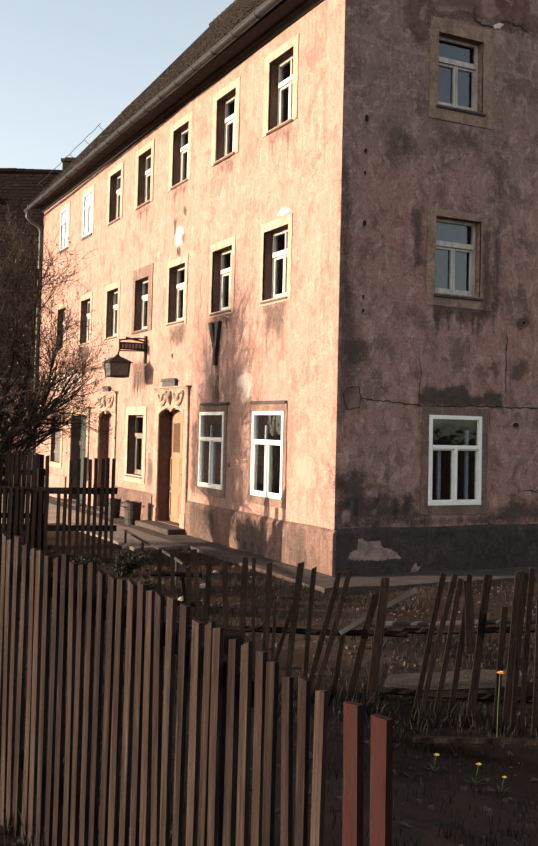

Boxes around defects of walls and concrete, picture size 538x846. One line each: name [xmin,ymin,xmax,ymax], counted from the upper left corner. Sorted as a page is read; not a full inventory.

crack [472,7,529,33]
flaking render [236,362,253,414]
crack [343,336,538,429]
water stain [417,386,501,407]
flaking render [344,531,424,572]